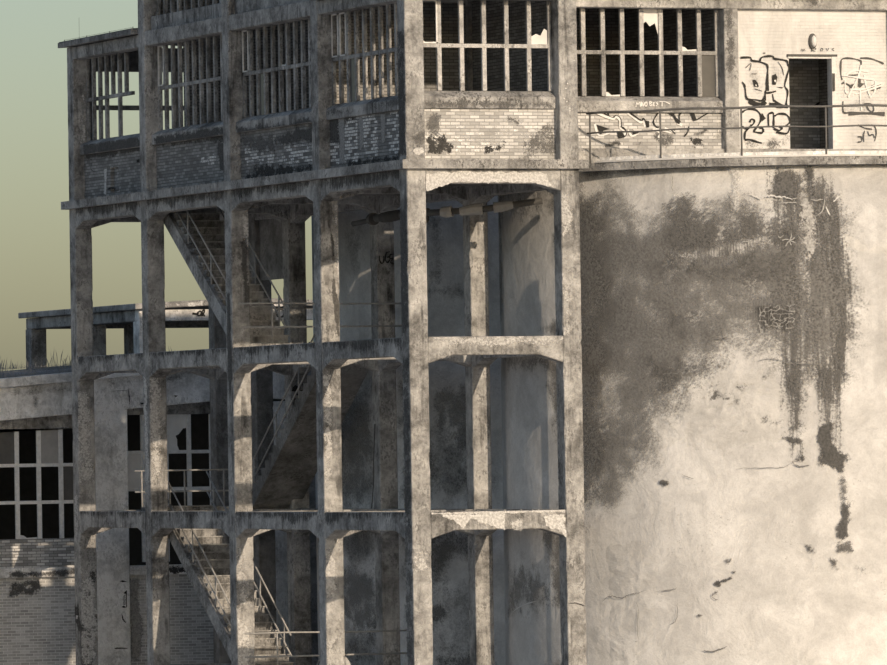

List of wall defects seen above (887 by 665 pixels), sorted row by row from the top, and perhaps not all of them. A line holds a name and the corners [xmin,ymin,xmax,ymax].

damp [78,205,408,393]
damp [434,321,570,347]
damp [498,166,862,567]
damp [429,387,467,494]
damp [236,358,414,665]
damp [432,605,445,622]
damp [431,531,468,581]
peeling [431,510,567,537]
damp [508,532,560,617]